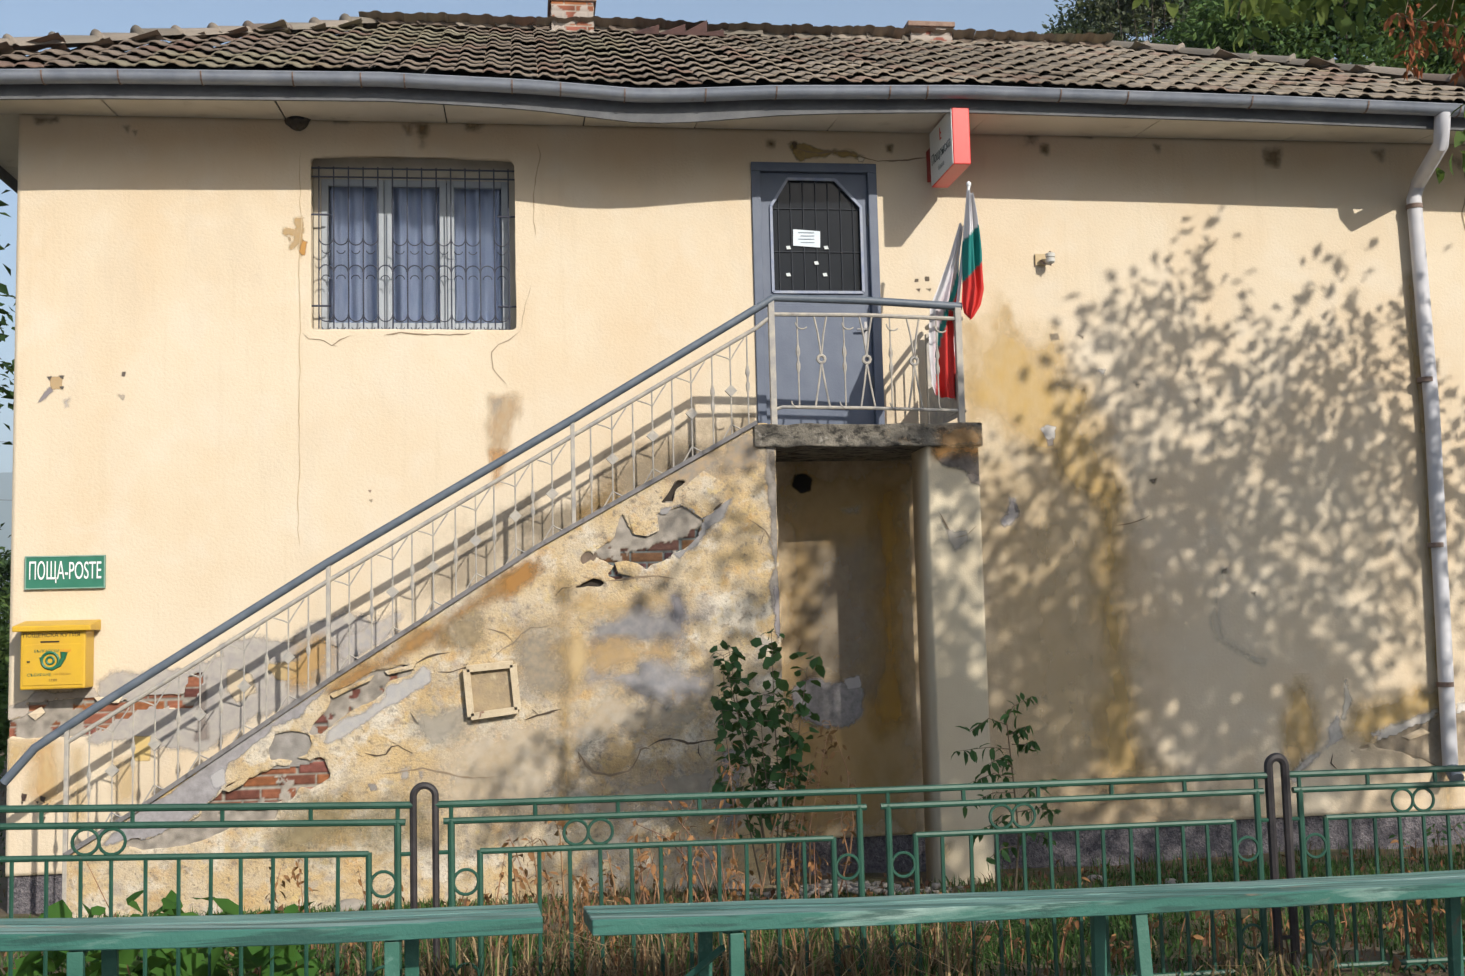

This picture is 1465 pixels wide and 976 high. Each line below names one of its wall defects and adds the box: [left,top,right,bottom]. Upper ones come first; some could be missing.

flaking render [933,445,980,485]
leakage [969,324,1119,570]
flaking render [580,479,732,581]
leakage [777,461,921,836]
peeling [8,610,431,850]
leakage [1286,684,1465,782]
flaking render [1351,711,1465,774]